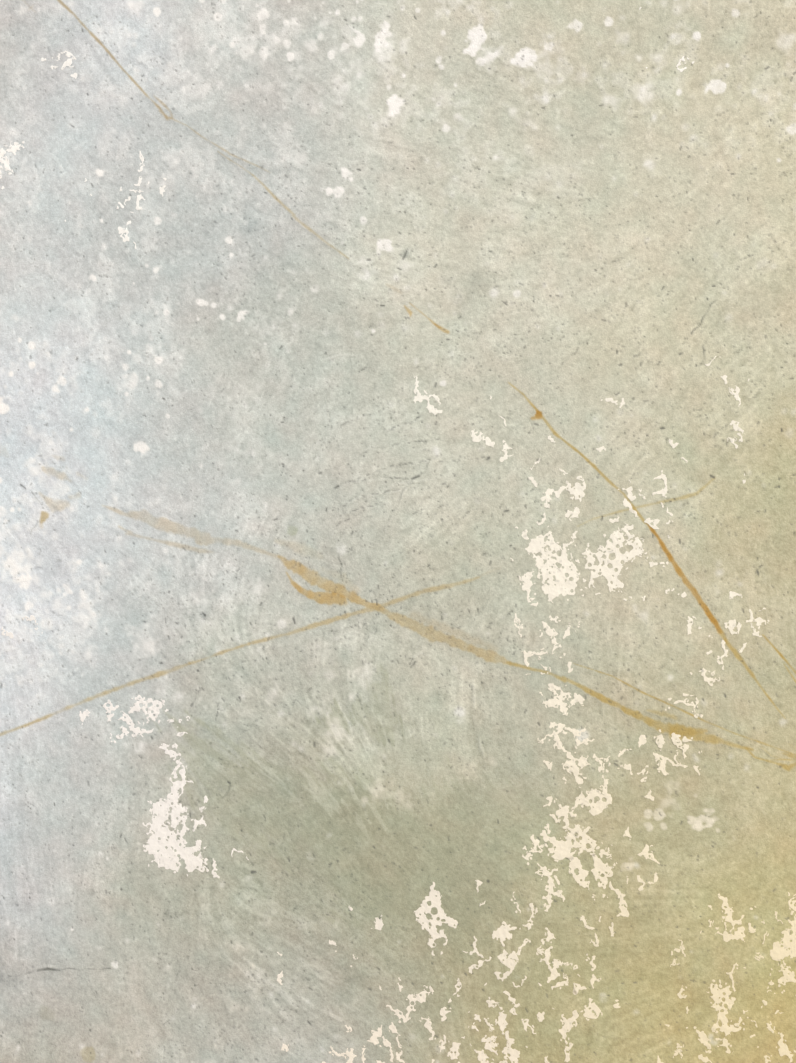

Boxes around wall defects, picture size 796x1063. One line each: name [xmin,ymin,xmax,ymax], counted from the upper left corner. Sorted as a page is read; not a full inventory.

peeling [471,416,512,462]
crack [20,485,85,579]
peeling [515,458,673,607]
peeling [103,695,220,878]
peeling [322,616,703,1063]
peeling [686,892,796,1063]